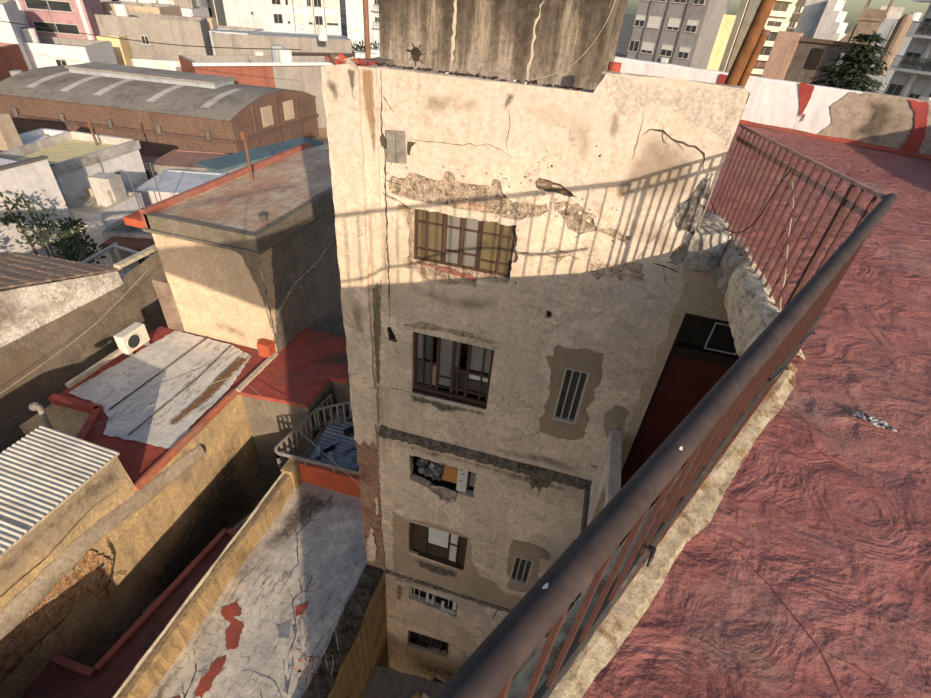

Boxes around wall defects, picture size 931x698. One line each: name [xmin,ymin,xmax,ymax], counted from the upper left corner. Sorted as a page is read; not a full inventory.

leakage [427,0,437,61]
leakage [450,0,489,71]
crack [526,1,544,80]
corrosion [363,70,375,149]
crack [632,114,705,170]
leakage [861,105,891,137]
flaking render [378,165,633,285]
crack [0,483,126,598]
peeling [392,512,523,609]
crack [0,601,78,684]
flaking render [0,550,113,680]
peeling [195,600,244,698]